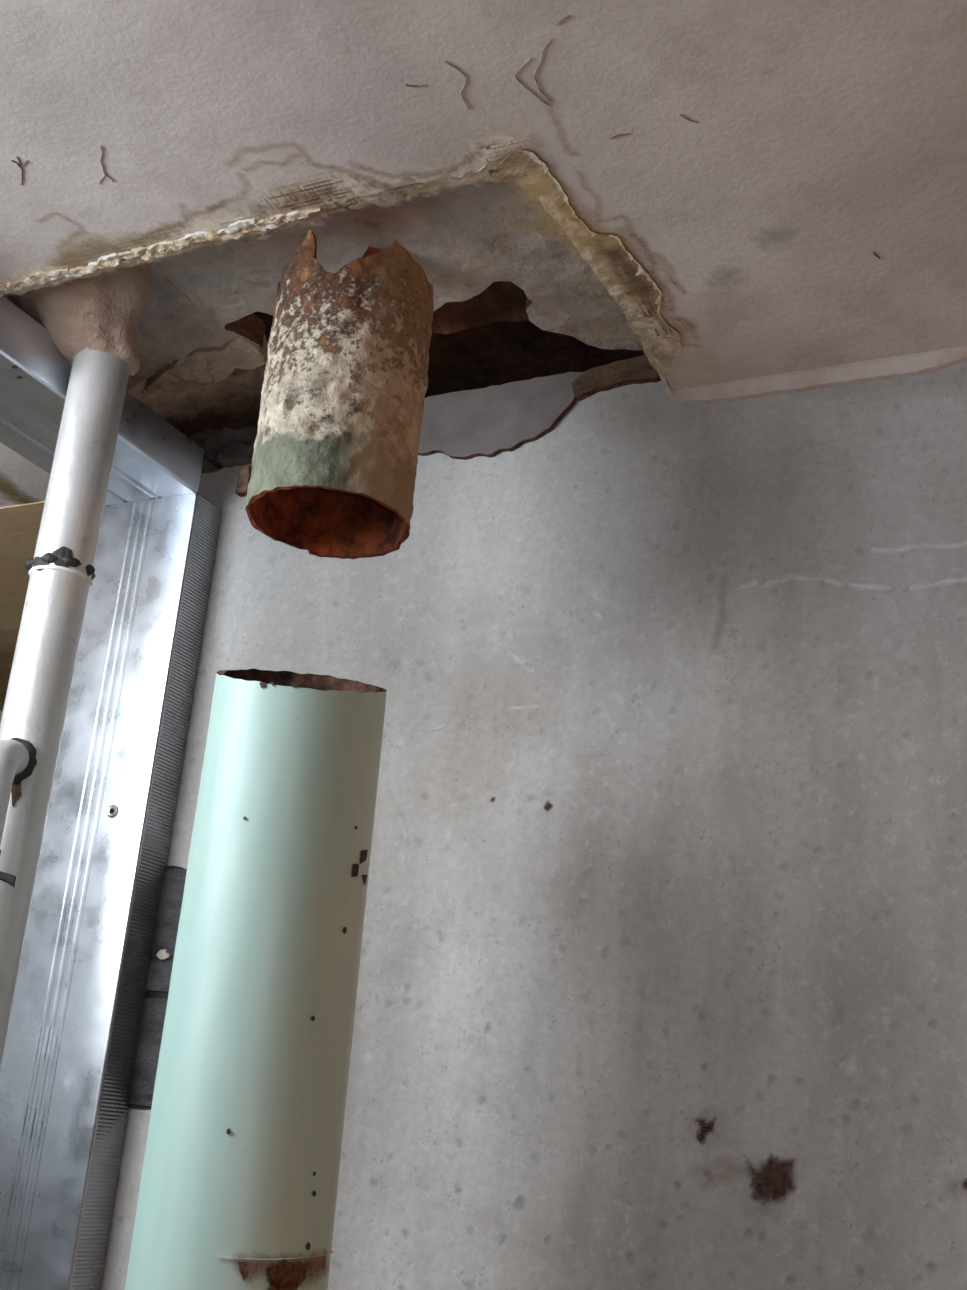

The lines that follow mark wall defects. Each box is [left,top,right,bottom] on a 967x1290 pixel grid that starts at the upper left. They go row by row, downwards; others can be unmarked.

crack [445,61,469,109]
crack [515,15,571,107]
crack [12,157,27,185]
water stain [0,126,688,352]
spalling [3,147,682,469]
corrosion [696,1119,714,1142]
corrosion [749,1157,794,1201]